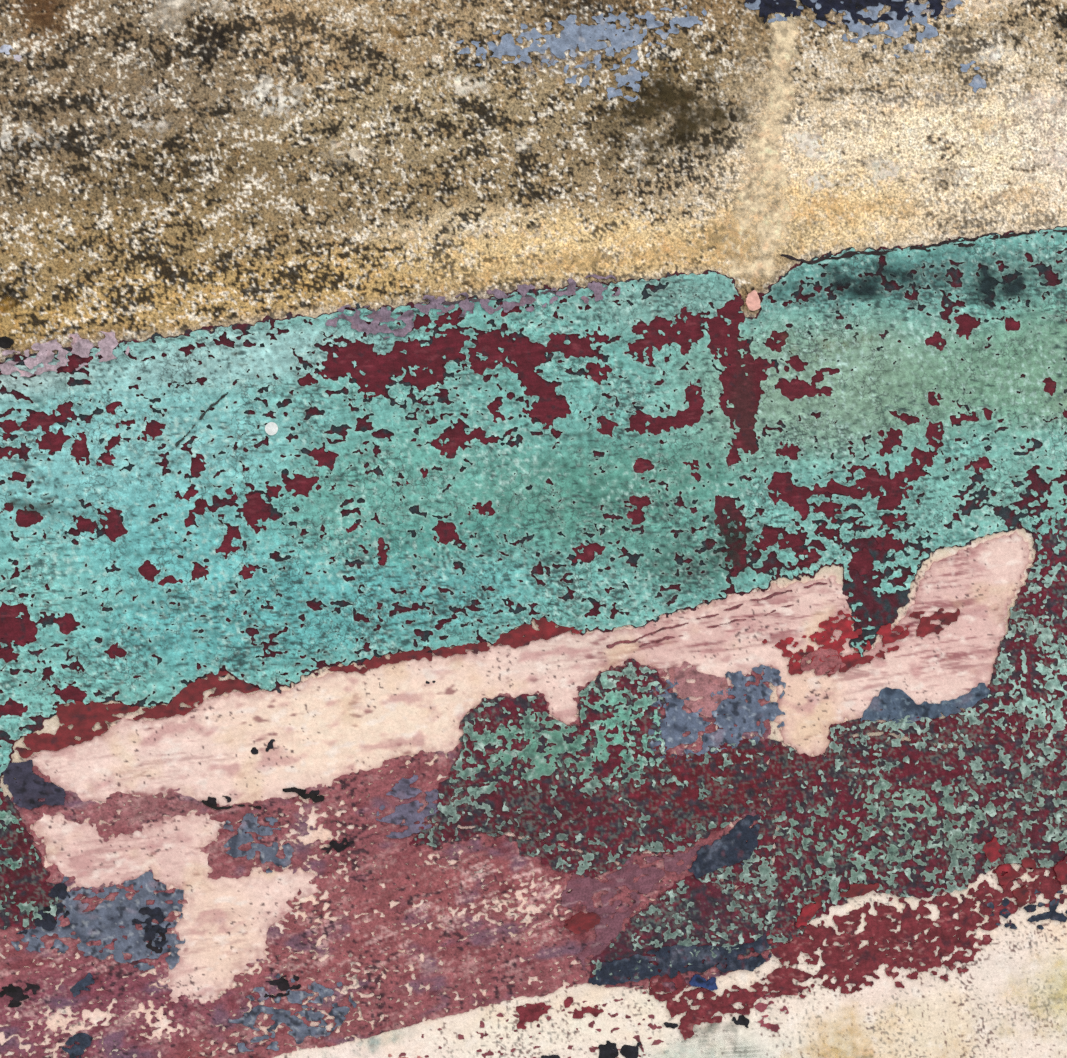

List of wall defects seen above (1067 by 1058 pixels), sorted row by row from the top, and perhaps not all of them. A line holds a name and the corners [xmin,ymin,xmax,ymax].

peeling [455,5,707,102]
peeling [744,0,963,58]
peeling [299,274,621,435]
peeling [597,294,840,467]
peeling [925,331,946,351]
peeling [954,313,980,340]
peeling [0,401,166,466]
peeling [431,401,506,459]
peeling [177,454,211,527]
peeling [215,448,339,559]
peeling [767,391,993,575]
flaking render [0,495,1067,1058]